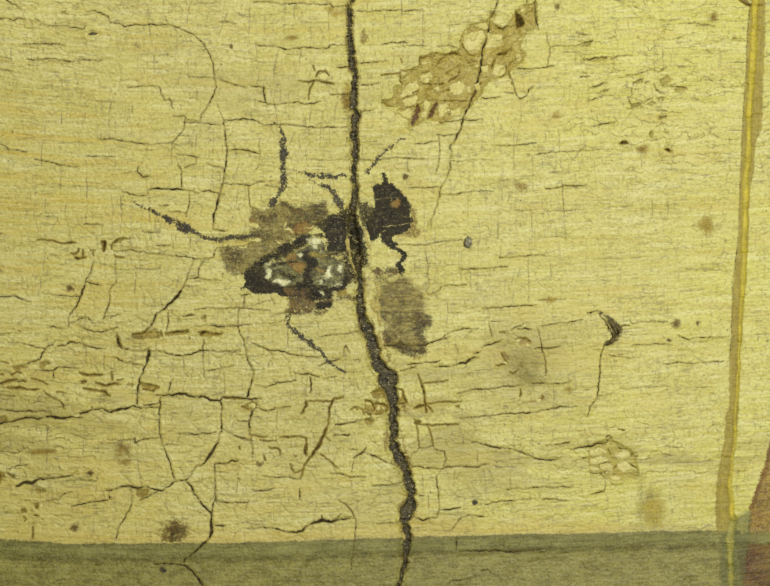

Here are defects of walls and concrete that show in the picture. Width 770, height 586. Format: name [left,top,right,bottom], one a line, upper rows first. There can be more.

peeling [380,3,537,133]
crack [0,0,583,586]
crack [588,348,633,414]
crack [462,435,608,461]